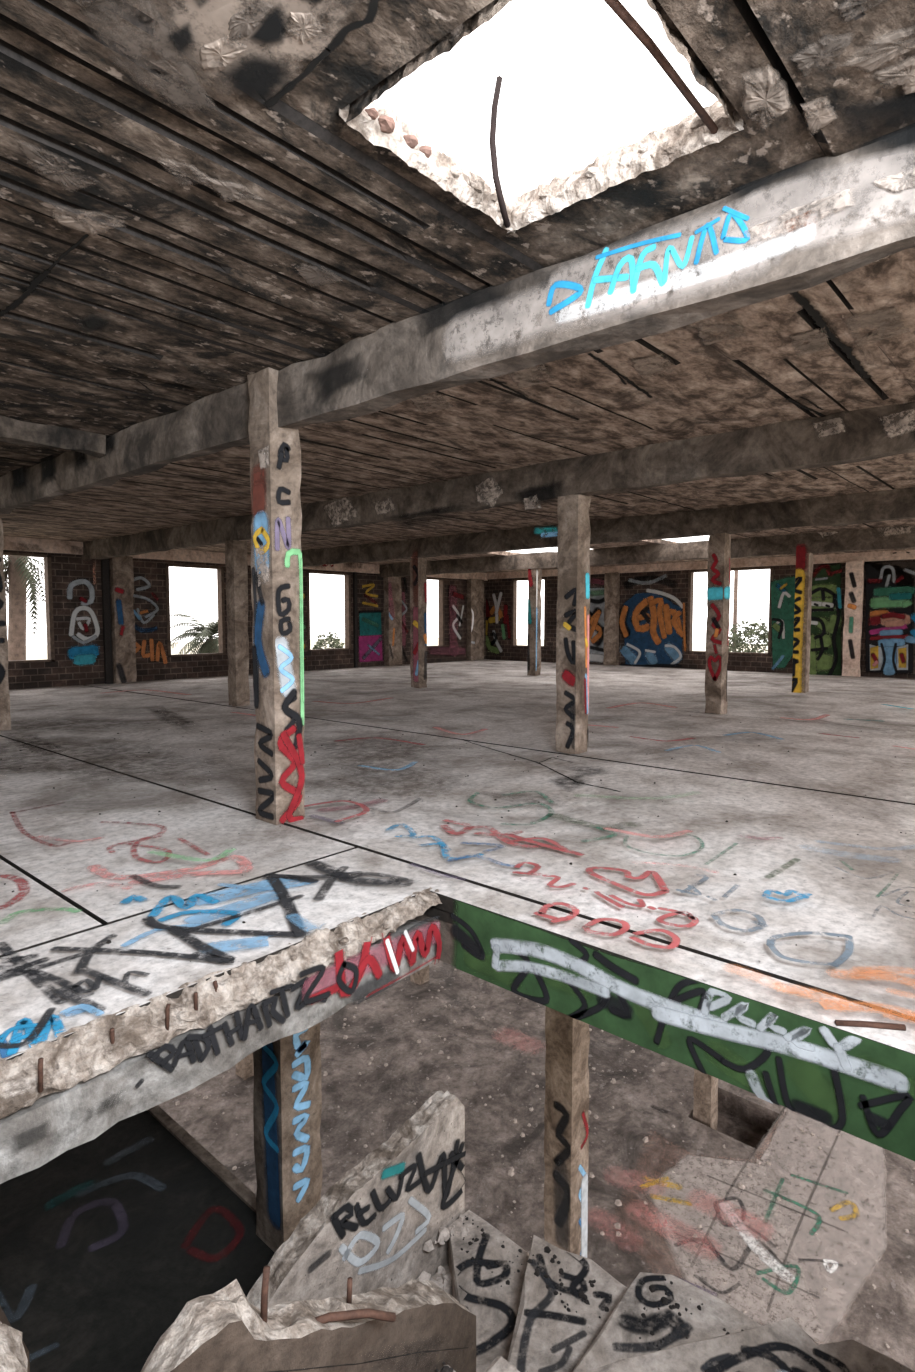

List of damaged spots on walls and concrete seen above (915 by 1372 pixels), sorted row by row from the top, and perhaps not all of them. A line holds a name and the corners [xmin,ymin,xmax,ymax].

water stain [170,25,193,50]
flaking render [791,0,915,95]
water stain [227,58,285,98]
spalling [339,0,837,233]
spalling [874,169,915,192]
spalling [745,188,852,244]
crack [0,234,89,317]
spalling [0,887,442,1119]
spalling [260,1265,270,1323]
spalling [315,1277,396,1324]
spalling [0,1322,28,1372]